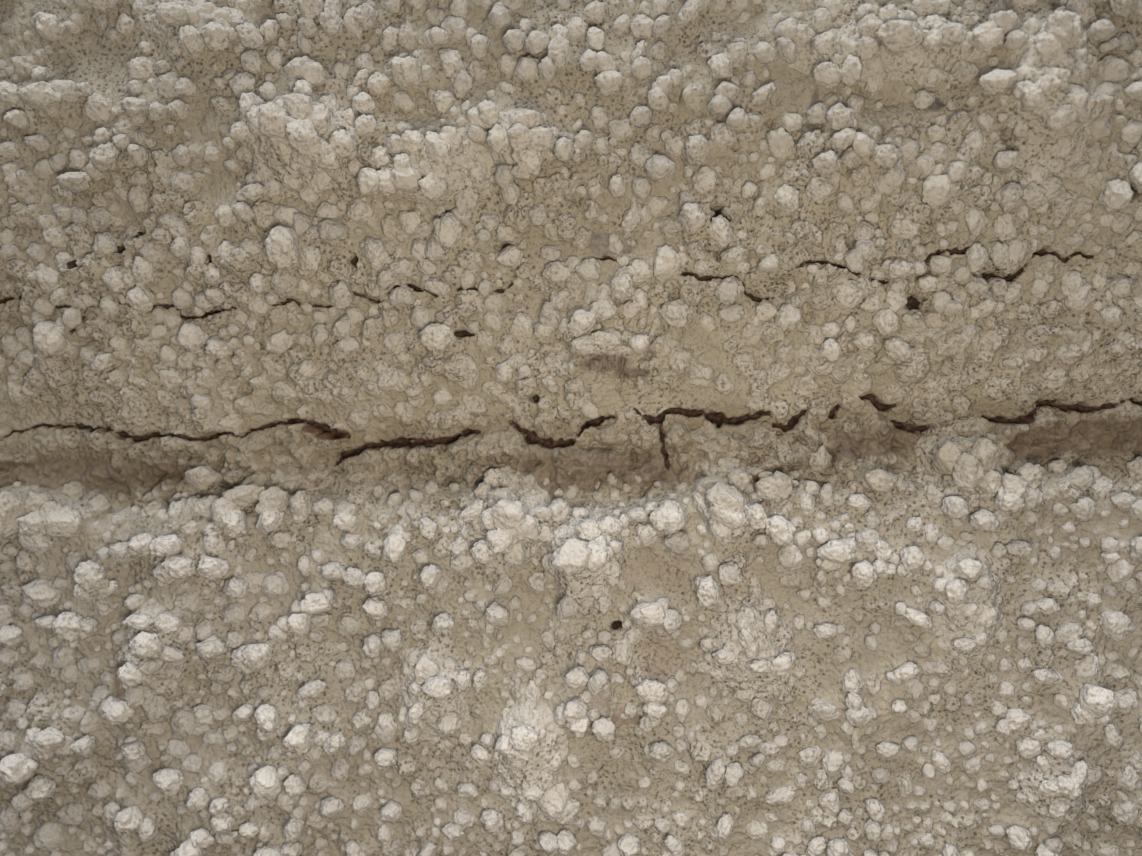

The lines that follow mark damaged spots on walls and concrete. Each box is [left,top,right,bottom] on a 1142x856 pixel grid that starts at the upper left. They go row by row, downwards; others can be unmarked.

crack [3,418,480,465]
crack [512,394,927,469]
crack [981,398,1142,424]